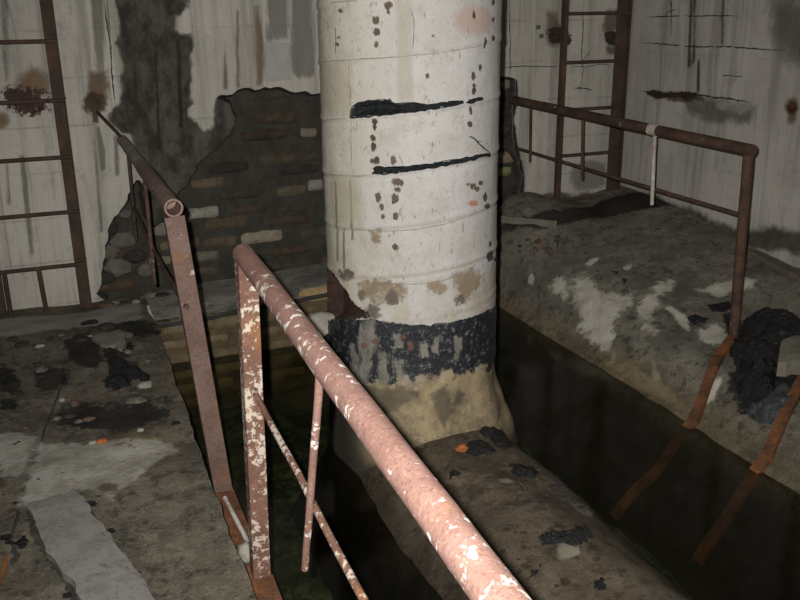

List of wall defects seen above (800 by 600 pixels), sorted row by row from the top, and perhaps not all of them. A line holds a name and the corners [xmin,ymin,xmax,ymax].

corrosion [0,72,51,128]
corrosion [84,73,109,123]
water stain [92,0,236,196]
spalling [176,87,370,322]
crack [331,27,483,171]
crack [372,136,491,175]
spalling [466,77,522,210]
water stain [670,0,752,122]
spalling [0,180,189,364]
spalling [259,307,294,350]
water stain [419,338,439,358]
water stain [454,336,462,359]